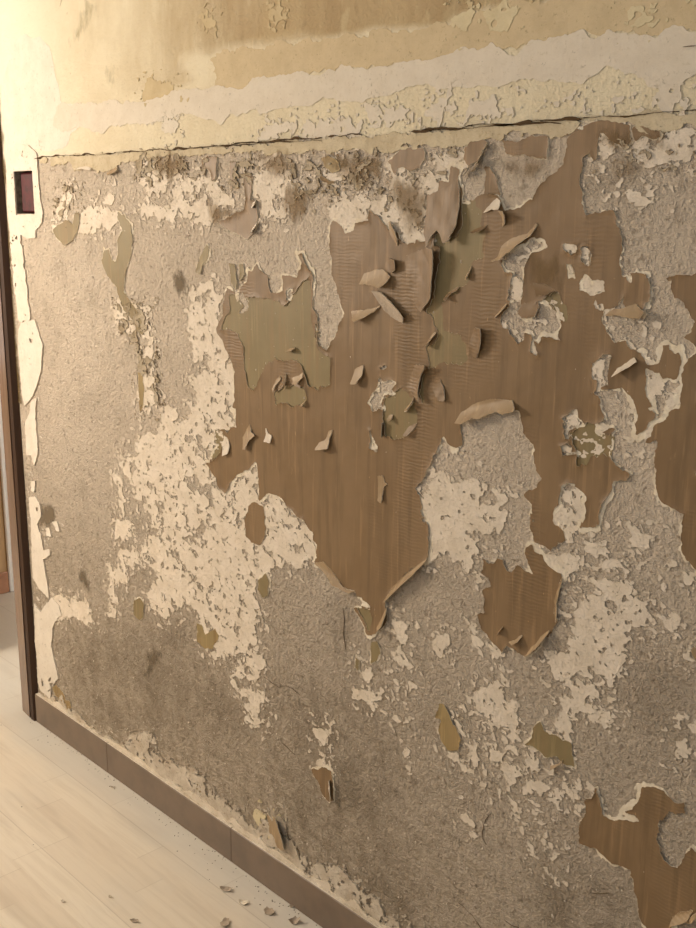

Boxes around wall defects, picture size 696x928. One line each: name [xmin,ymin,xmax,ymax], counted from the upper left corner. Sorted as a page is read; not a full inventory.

crack [411,109,696,133]
crack [35,133,361,159]
peeling [603,177,678,213]
peeling [616,518,659,570]
peeling [424,623,463,659]
peeling [655,610,687,639]
spalling [26,471,412,928]
peeling [399,729,416,775]
peeling [658,713,696,773]
peeling [451,795,488,842]
peeling [523,818,571,862]
peeling [542,865,569,888]